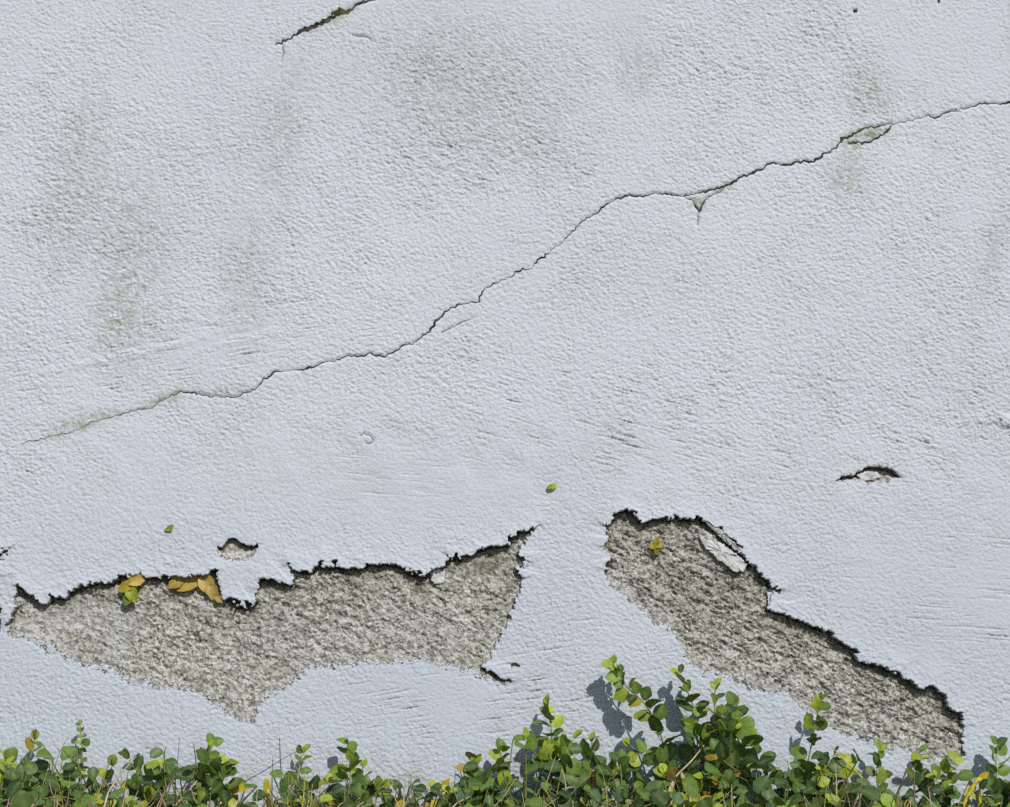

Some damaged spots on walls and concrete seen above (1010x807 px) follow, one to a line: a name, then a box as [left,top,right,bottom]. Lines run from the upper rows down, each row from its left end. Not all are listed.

crack [275,0,373,58]
crack [20,101,1010,444]
spalling [836,466,901,485]
spalling [0,527,537,723]
spalling [603,509,966,767]